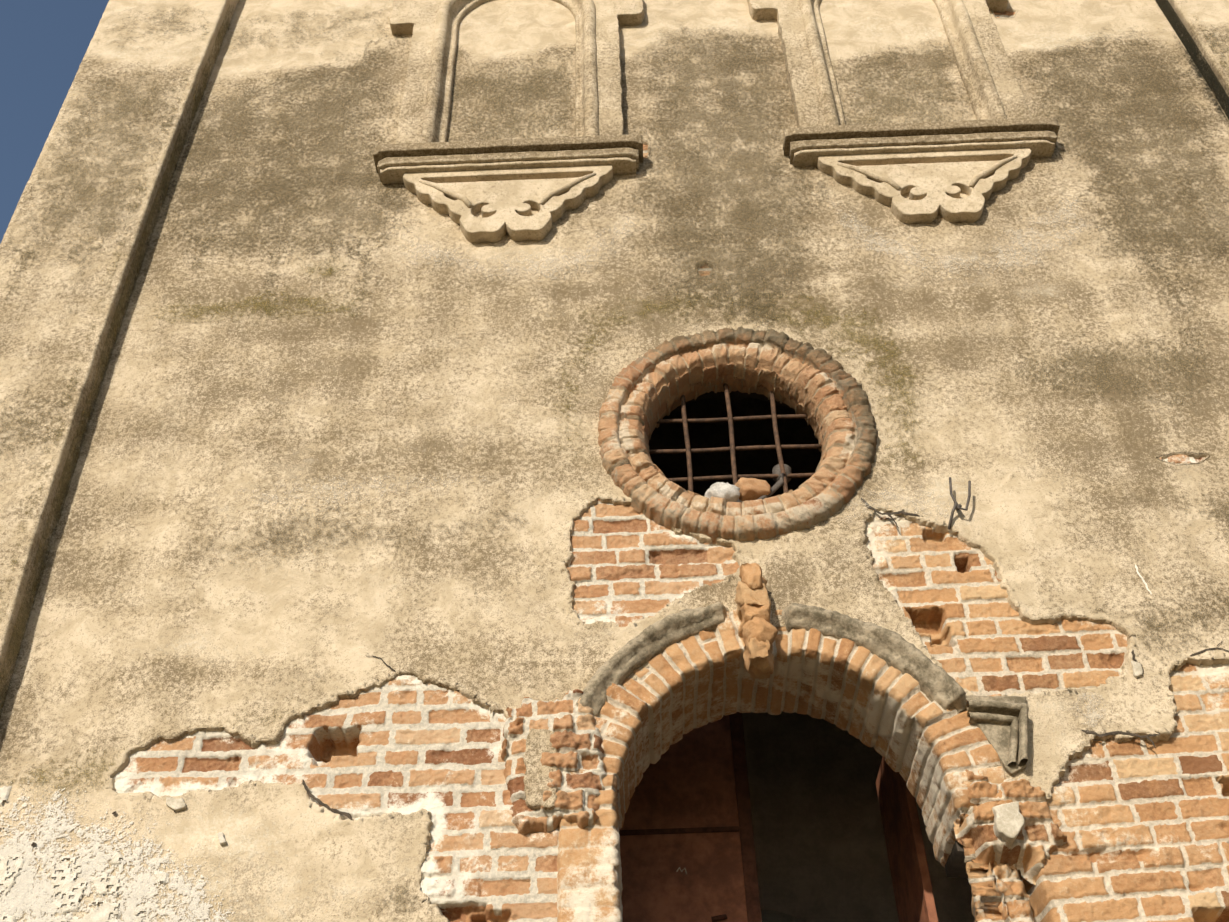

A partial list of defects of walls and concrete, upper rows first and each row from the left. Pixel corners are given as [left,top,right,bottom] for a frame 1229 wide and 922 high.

leakage [9,73,175,295]
leakage [163,41,414,295]
leakage [633,27,812,324]
leakage [987,0,1229,310]
leakage [576,602,729,717]
flaking render [559,493,747,633]
leakage [781,603,966,714]
flaking render [857,503,1143,700]
spalling [1156,452,1210,465]
peeling [49,852,152,922]
flaking render [104,667,559,922]
flaking render [1021,652,1229,922]